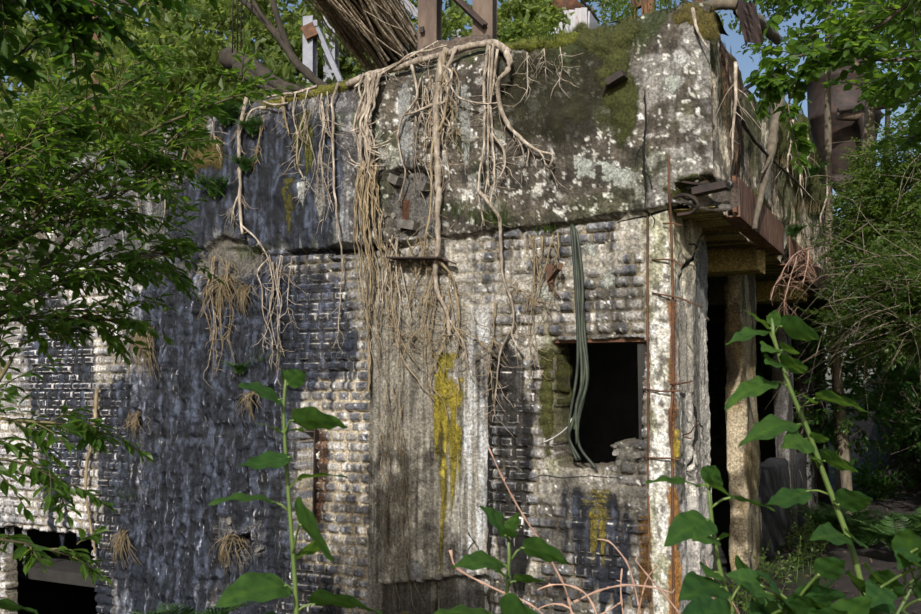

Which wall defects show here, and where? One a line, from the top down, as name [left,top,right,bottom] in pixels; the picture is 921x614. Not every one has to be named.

crack [617,91,686,227]
rust [667,299,677,389]
damp [433,352,462,573]
rust [668,400,677,444]
rust [667,486,679,527]
rust [668,544,681,614]